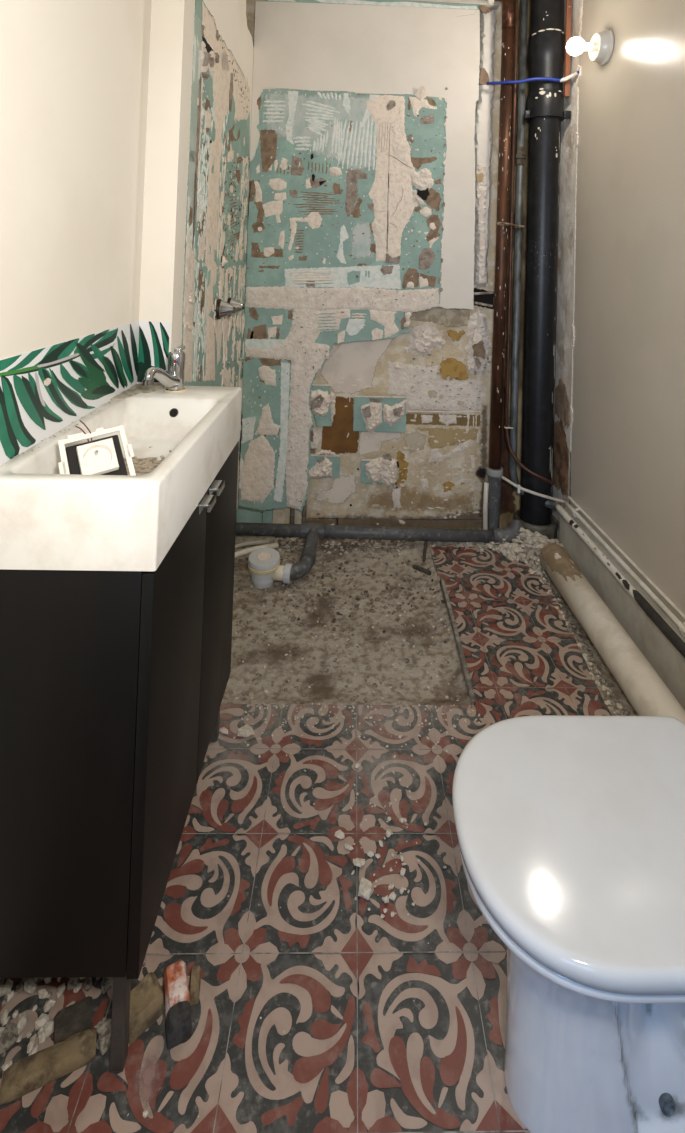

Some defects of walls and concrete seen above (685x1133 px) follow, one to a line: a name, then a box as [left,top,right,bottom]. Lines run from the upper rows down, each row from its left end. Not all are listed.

peeling [189,41,322,382]
peeling [239,362,290,503]
flaking render [359,431,401,456]
spalling [413,540,475,702]